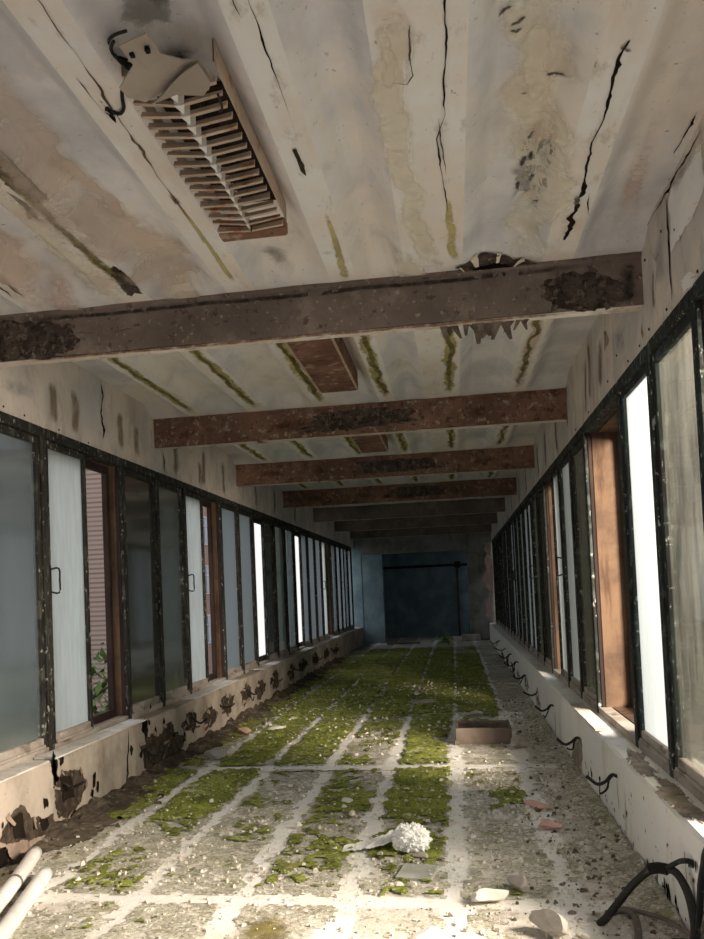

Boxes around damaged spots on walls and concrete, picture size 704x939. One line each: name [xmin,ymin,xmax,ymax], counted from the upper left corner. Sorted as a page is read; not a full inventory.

crack [38,0,203,242]
crack [232,0,295,131]
leakage [372,26,435,276]
crack [394,25,414,85]
crack [436,0,448,211]
leakage [499,0,574,240]
crack [563,41,630,240]
leakage [0,193,116,293]
leakage [171,267,197,299]
peeling [440,319,529,344]
spalling [456,252,537,272]
spalling [0,751,99,869]